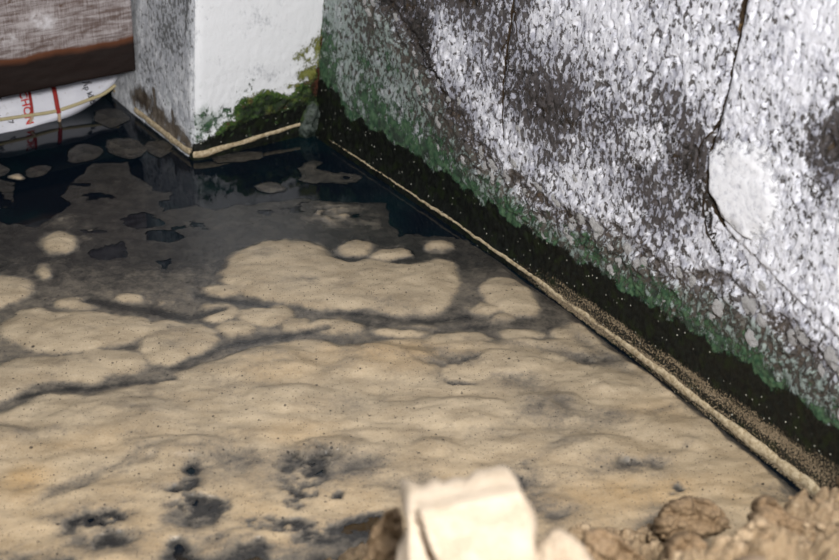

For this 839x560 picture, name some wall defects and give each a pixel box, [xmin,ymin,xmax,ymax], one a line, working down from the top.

leakage [130,87,307,160]
crack [496,0,517,141]
leakage [500,51,614,144]
crack [697,0,747,248]
leakage [315,79,839,499]